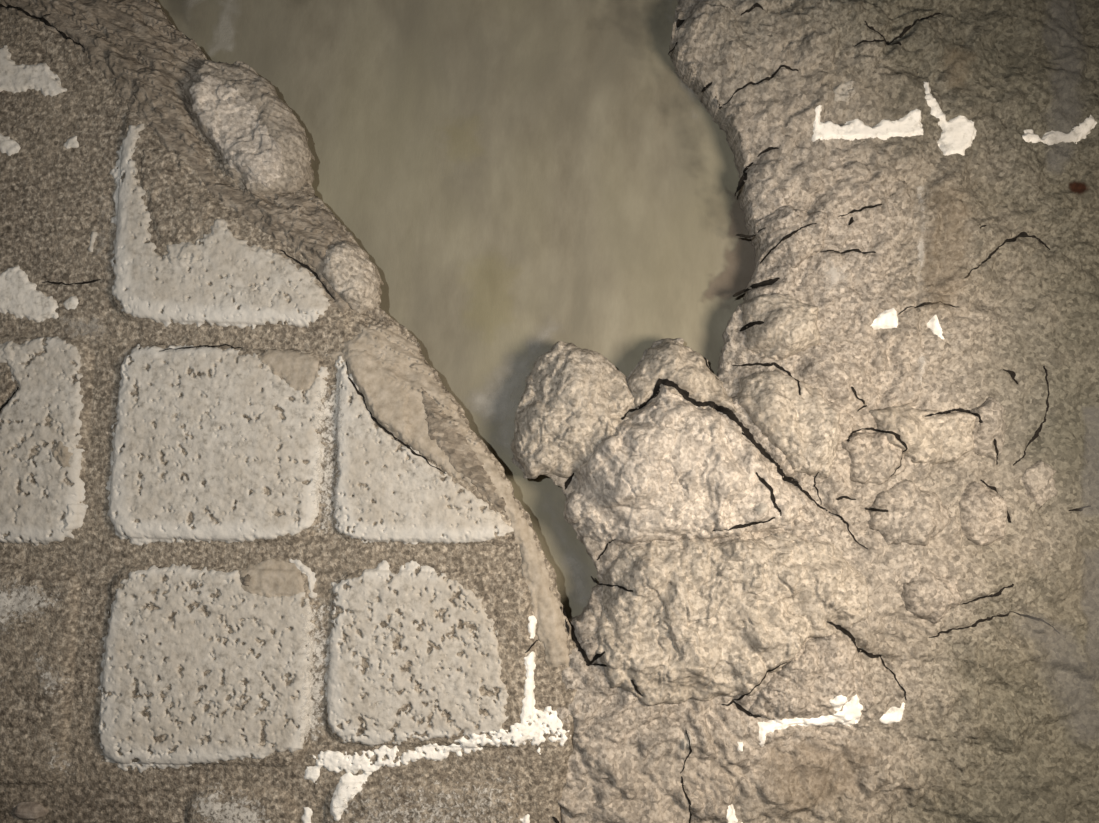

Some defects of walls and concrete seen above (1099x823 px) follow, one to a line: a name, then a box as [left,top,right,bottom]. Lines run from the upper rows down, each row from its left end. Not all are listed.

spalling [0,0,352,330]
peeling [811,80,977,156]
peeling [1022,114,1097,145]
crack [733,204,882,297]
crack [346,361,447,474]
crack [621,357,889,549]
crack [847,387,908,476]
crack [925,366,1050,523]
peeling [98,324,571,823]
crack [827,621,907,700]
peeling [758,694,863,747]
peeling [879,702,905,724]